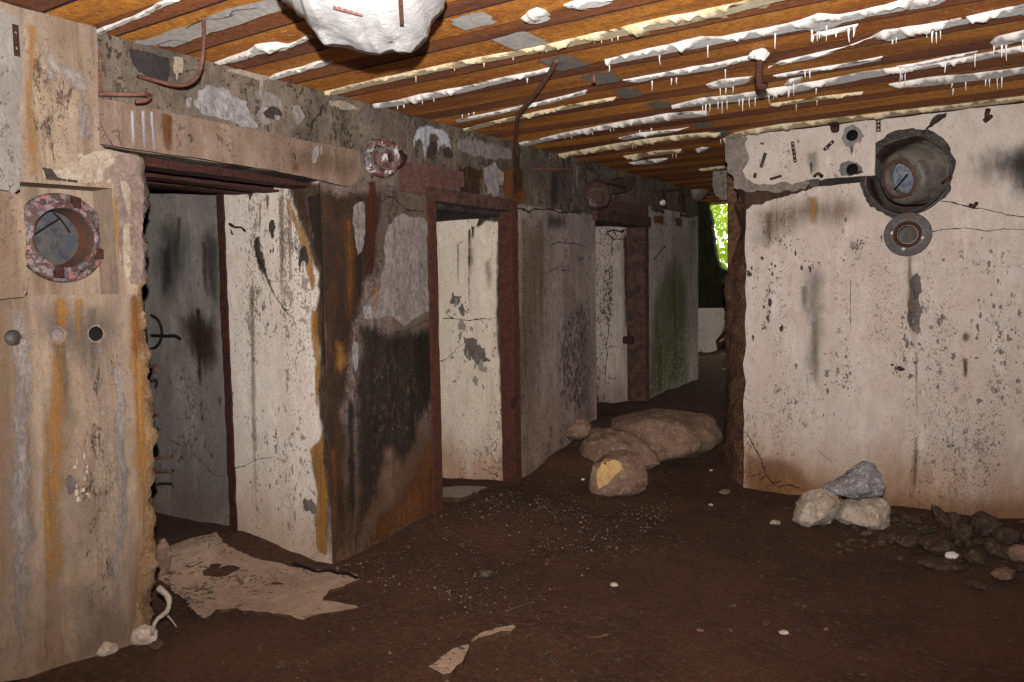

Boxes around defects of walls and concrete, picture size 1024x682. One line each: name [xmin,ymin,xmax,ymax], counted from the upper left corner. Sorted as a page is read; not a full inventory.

peeling [186,85,358,163]
peeling [363,213,429,326]
spalling [538,55,820,341]
crack [932,200,1024,232]
corrosion [45,343,66,558]
corrosion [132,296,145,473]
leakage [186,309,214,374]
corrosion [248,182,380,554]
leakage [348,327,431,515]
crack [394,316,496,362]
peeling [445,292,497,390]
crack [746,431,801,489]